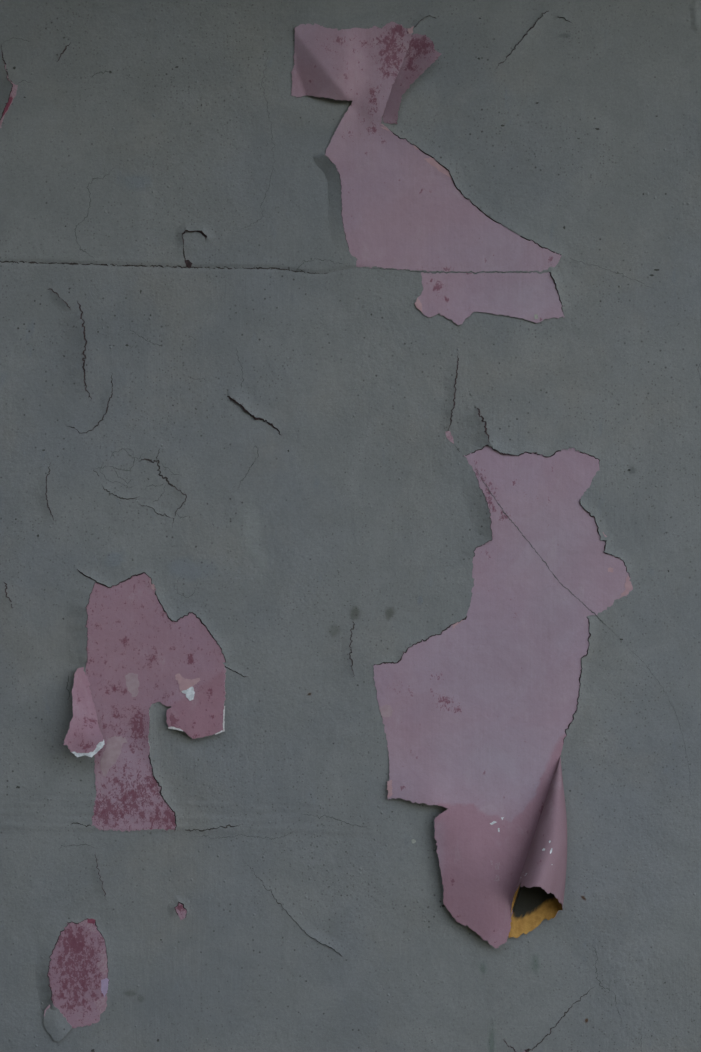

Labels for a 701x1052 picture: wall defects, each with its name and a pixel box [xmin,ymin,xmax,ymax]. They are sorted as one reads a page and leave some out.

crack [0,170,342,439]
peeling [291,7,573,325]
crack [93,448,187,527]
peeling [62,561,253,840]
peeling [366,433,640,948]
peeling [35,909,116,1042]